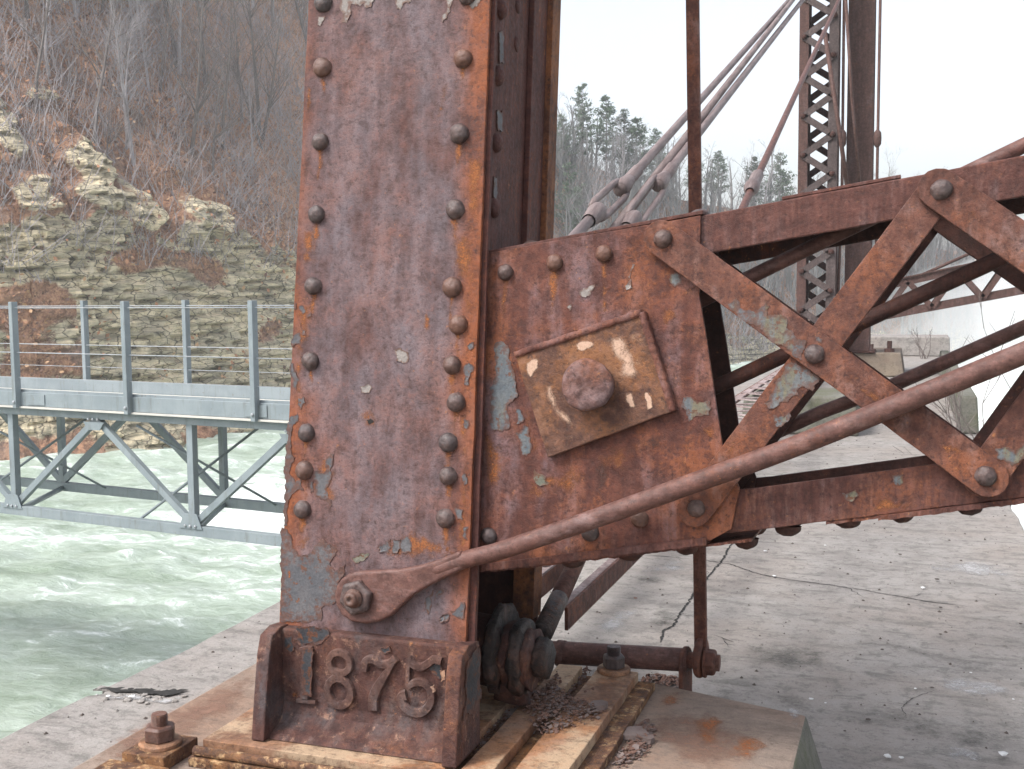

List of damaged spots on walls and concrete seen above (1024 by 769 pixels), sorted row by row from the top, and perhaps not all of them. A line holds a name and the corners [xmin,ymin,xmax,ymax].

peeling [339,0,374,23]
peeling [577,341,593,351]
peeling [612,339,635,376]
peeling [728,298,822,427]
peeling [490,341,538,456]
peeling [626,393,652,409]
peeling [681,397,711,421]
peeling [995,444,1024,465]
peeling [279,362,412,697]
corrosion [398,524,464,554]
crack [660,544,962,643]
peeling [429,664,445,693]